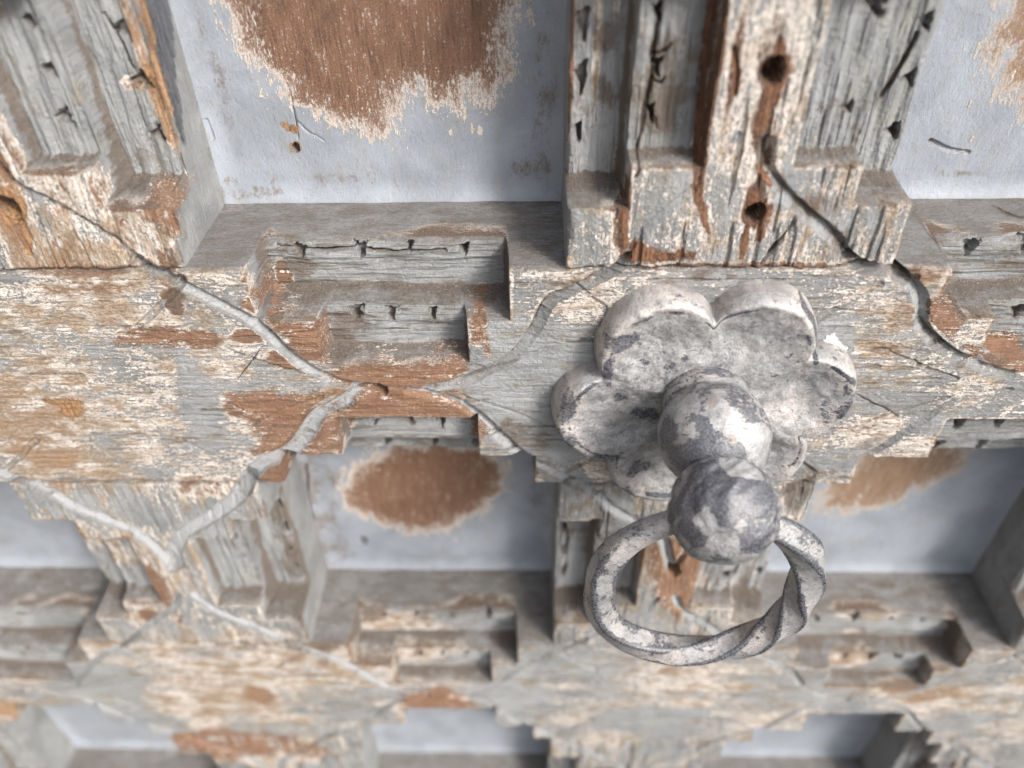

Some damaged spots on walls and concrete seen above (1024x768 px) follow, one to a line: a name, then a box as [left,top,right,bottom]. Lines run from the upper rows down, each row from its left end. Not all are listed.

peeling [203,0,548,155]
peeling [957,0,1024,128]
crack [760,221,793,264]
peeling [109,323,220,354]
peeling [215,269,522,545]
peeling [808,447,982,521]